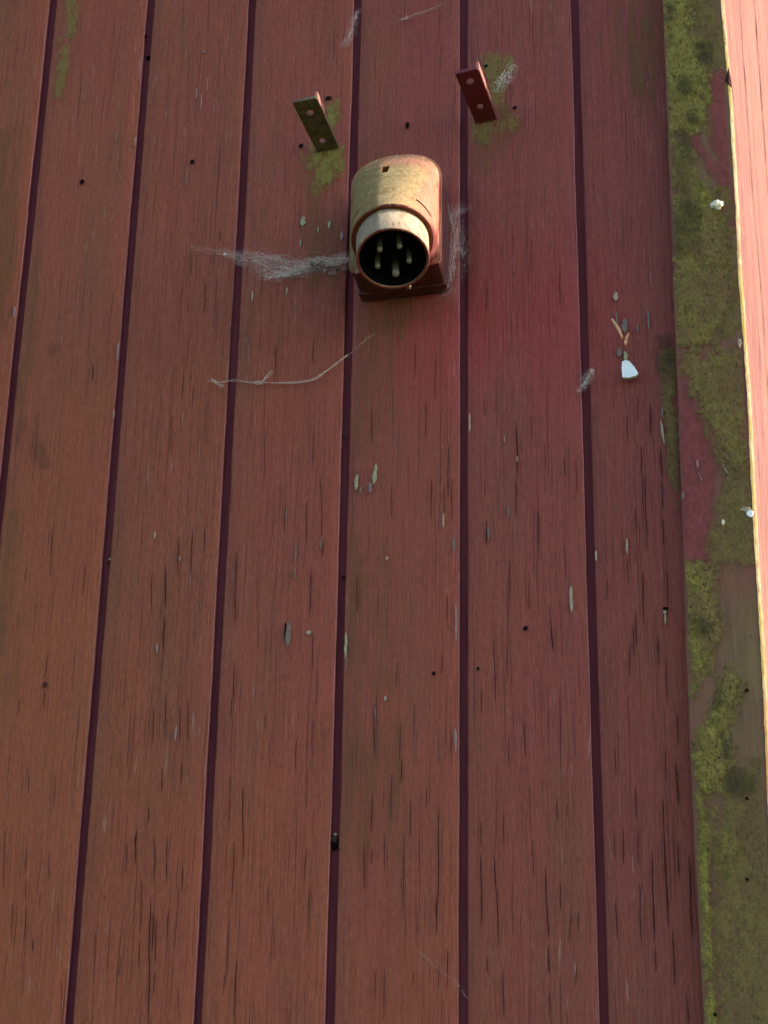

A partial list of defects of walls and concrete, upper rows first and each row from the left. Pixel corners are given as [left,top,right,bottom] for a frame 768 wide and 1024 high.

peeling [354,464,377,494]